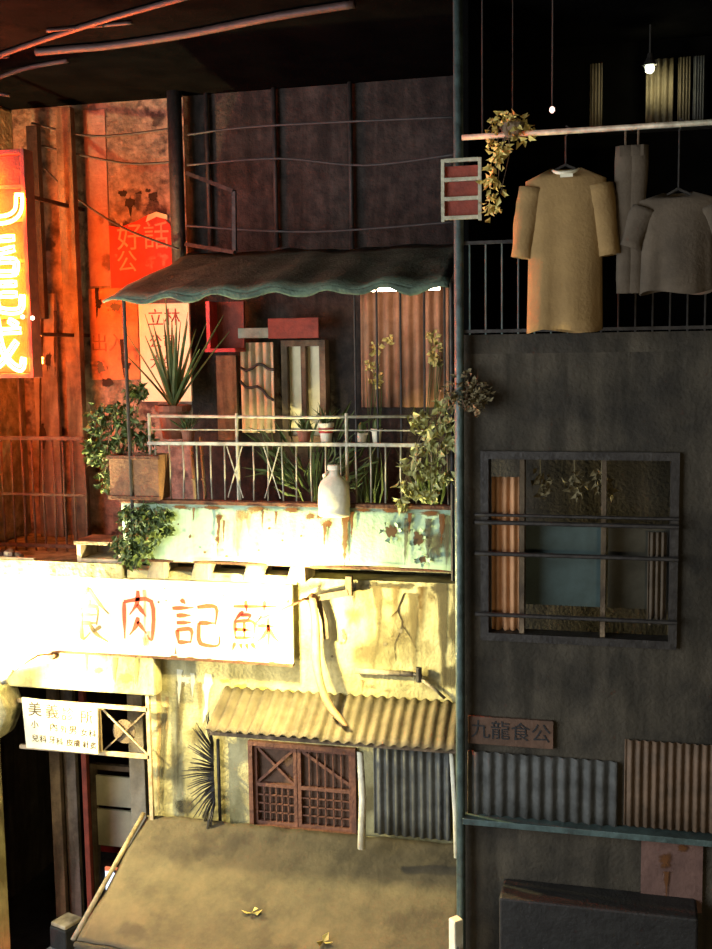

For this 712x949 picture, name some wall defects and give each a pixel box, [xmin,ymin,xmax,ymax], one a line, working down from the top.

corrosion [173,505,369,567]
corrosion [382,508,445,544]
crack [391,593,417,660]